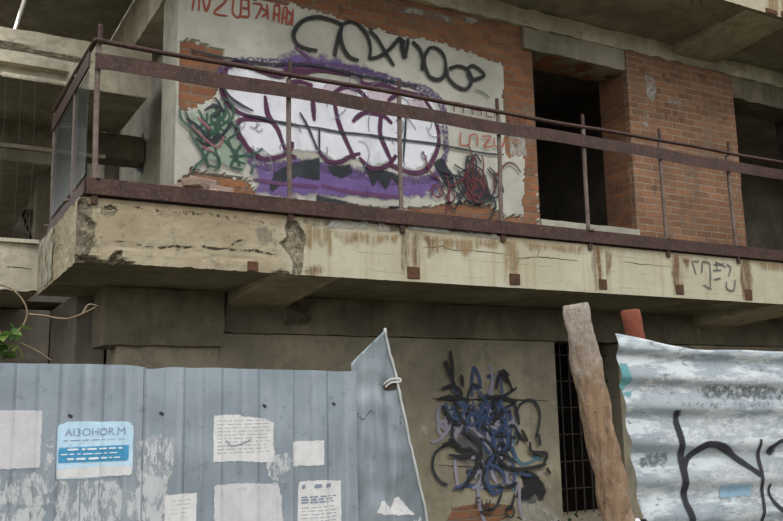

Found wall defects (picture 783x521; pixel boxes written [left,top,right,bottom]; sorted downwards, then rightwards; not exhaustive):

peeling [180,41,224,73]
peeling [253,0,534,127]
peeling [179,82,218,111]
peeling [178,170,255,195]
peeling [408,135,538,224]
spalling [75,198,132,265]
spalling [262,213,356,275]
corrosion [593,247,611,279]
corrosion [672,255,689,289]